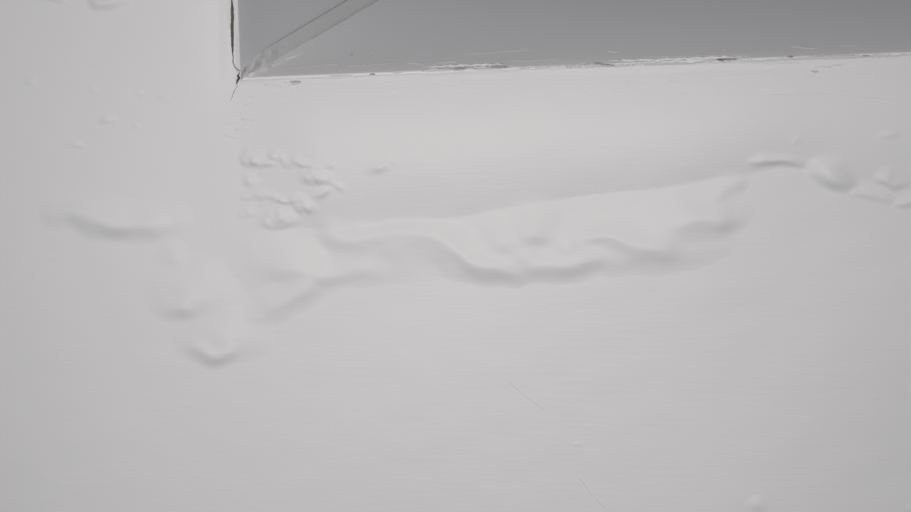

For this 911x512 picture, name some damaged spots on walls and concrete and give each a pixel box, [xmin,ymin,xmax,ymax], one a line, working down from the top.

crack [230,0,240,101]
crack [261,0,378,52]
crack [278,53,911,82]